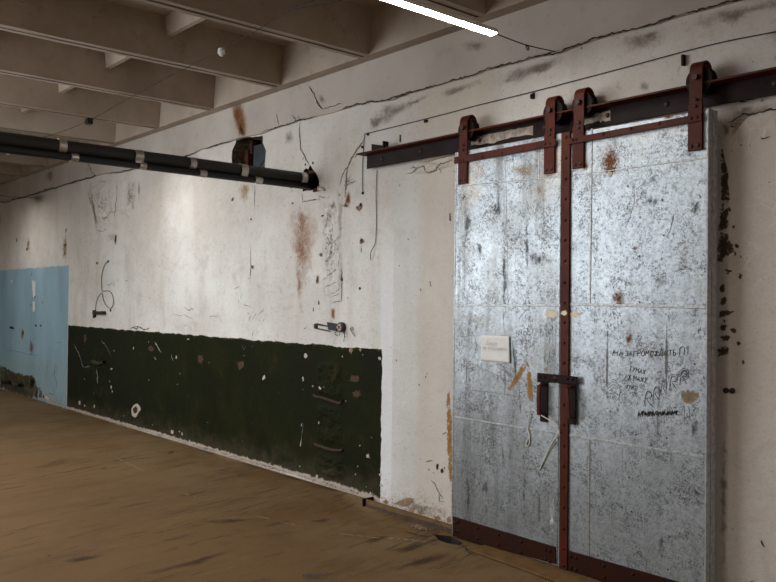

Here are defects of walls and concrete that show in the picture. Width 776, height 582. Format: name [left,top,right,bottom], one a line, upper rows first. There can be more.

crack [263,0,742,162]
corrosion [234,105,245,135]
crack [726,99,776,127]
spalling [232,136,266,167]
crack [408,155,455,174]
corrosion [601,149,619,173]
flaking render [717,139,750,279]
flaking render [717,284,741,357]
peeling [0,365,45,398]